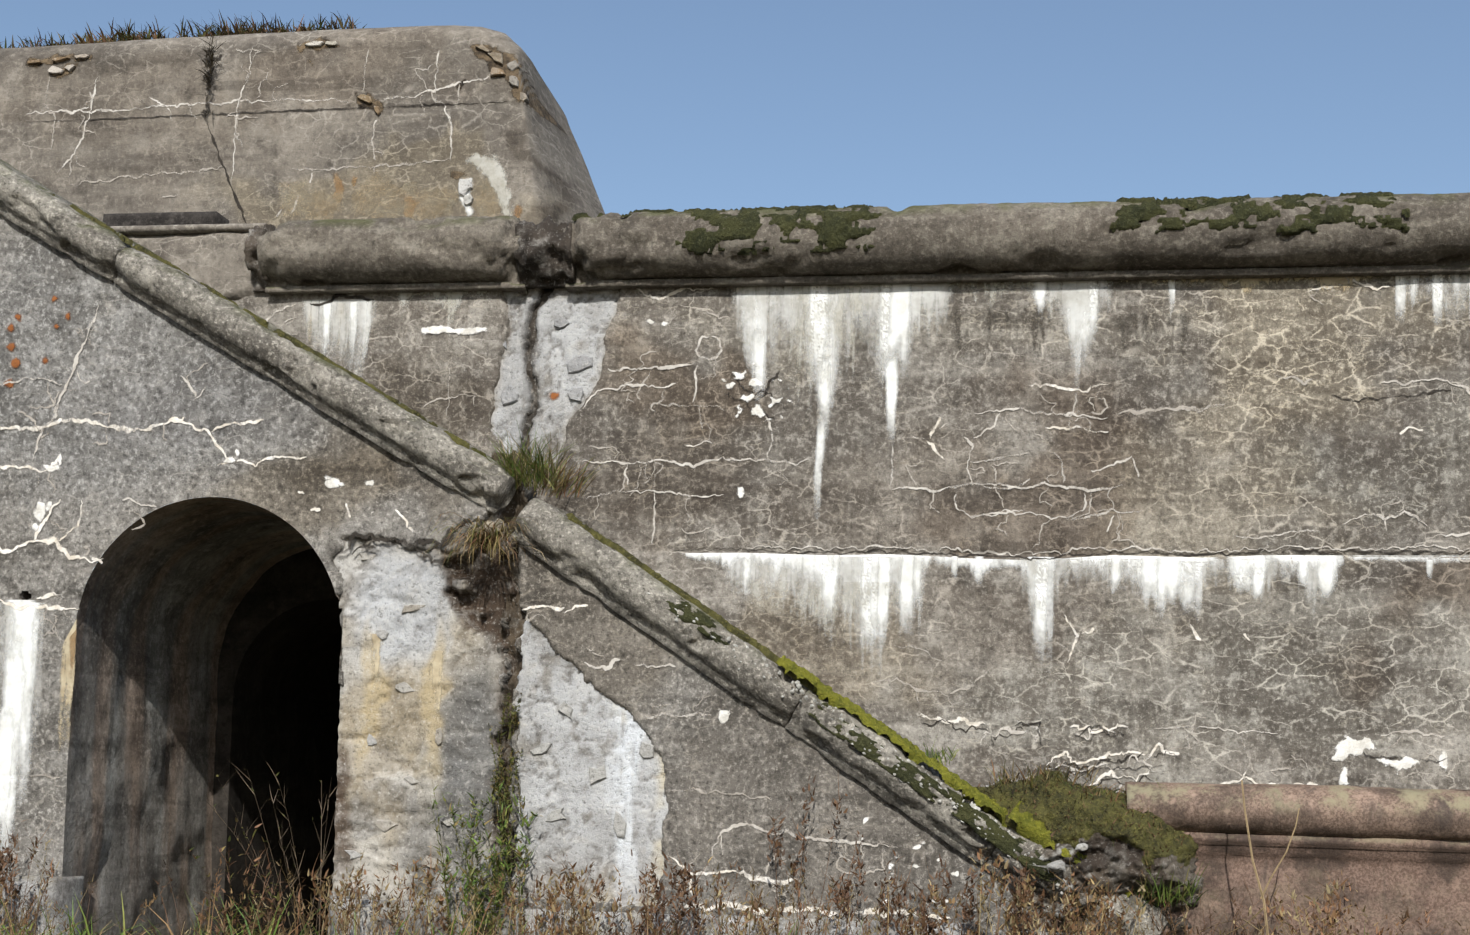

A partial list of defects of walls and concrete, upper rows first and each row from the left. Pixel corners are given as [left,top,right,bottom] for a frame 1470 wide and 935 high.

crack [26,48,507,224]
rust [4,314,21,388]
efflorescence [305,299,372,349]
peeling [491,215,619,470]
crack [574,288,810,543]
leakage [722,280,1148,494]
crack [890,383,1225,550]
leakage [1395,274,1470,313]
crack [0,289,588,877]
efflorescence [673,544,1470,641]
efflorescence [0,600,40,840]
spalling [332,512,668,907]